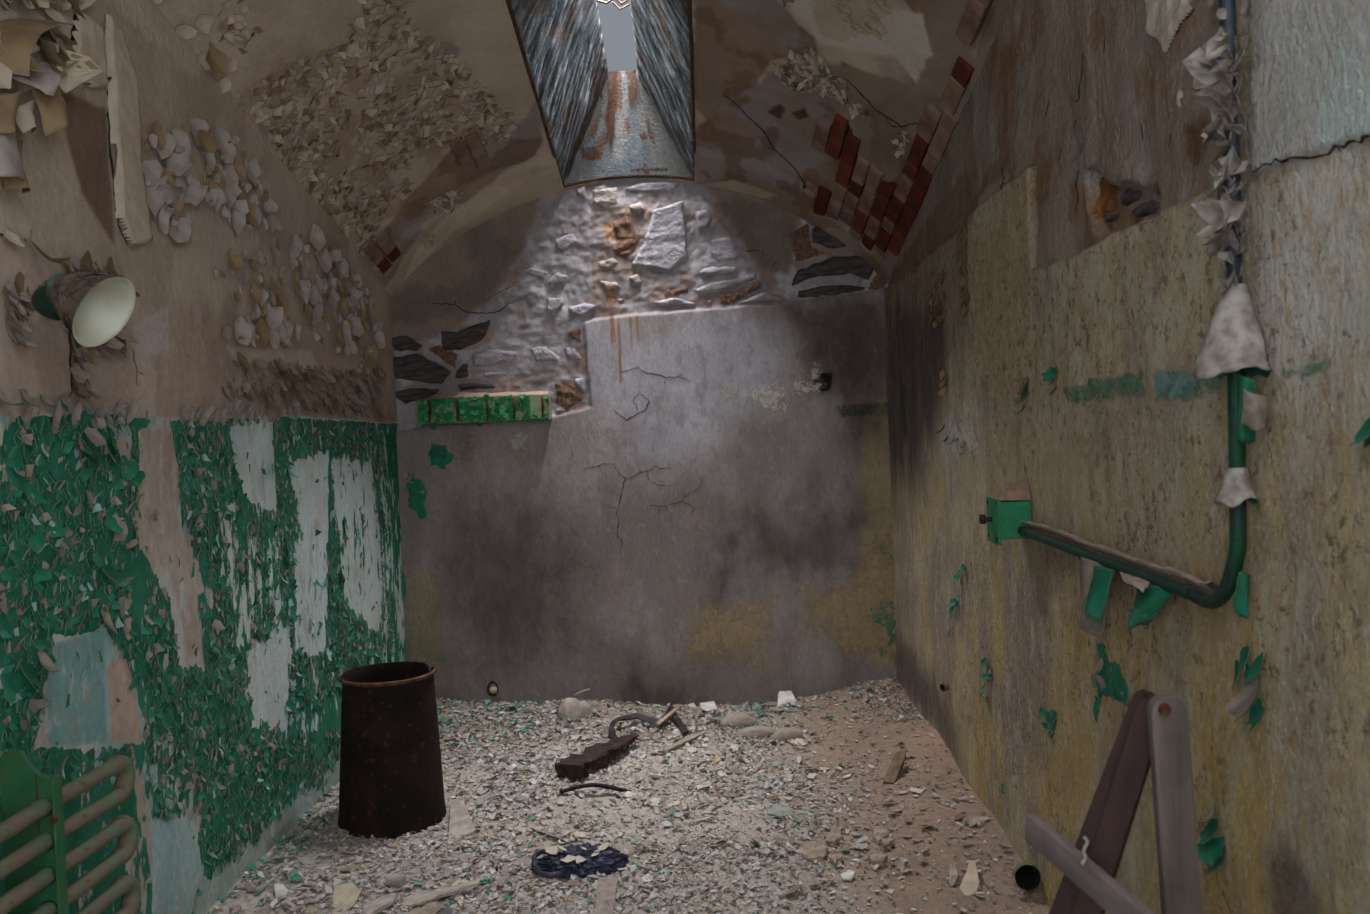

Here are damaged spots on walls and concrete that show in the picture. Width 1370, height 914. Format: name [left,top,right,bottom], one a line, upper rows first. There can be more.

flaking render [769,0,993,257]
peeling [1182,0,1256,295]
crack [1252,134,1370,172]
corrosion [609,287,638,379]
peeling [0,0,518,914]
peeling [417,394,550,470]
crack [613,366,689,421]
crack [584,463,707,558]